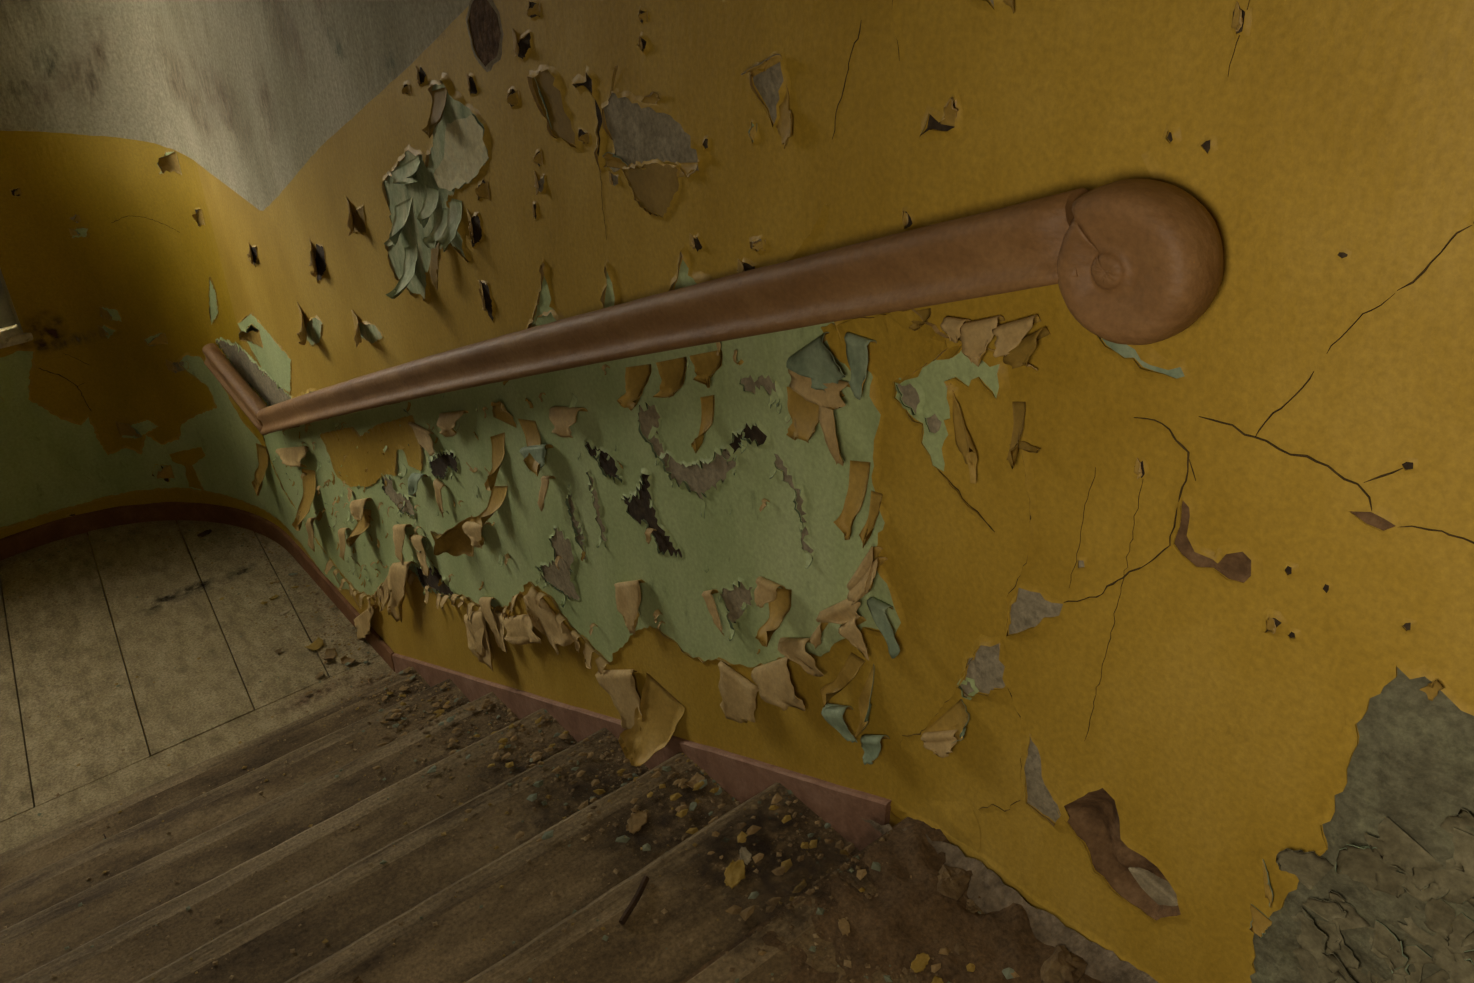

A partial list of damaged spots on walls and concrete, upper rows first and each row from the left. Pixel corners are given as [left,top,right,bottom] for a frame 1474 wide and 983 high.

peeling [246,242,259,268]
peeling [208,277,324,407]
peeling [308,239,329,285]
peeling [346,197,368,236]
peeling [382,0,713,329]
peeling [741,51,793,149]
peeling [0,308,1068,767]
crack [934,467,995,535]
crack [1061,225,1474,741]
spalling [862,799,1168,983]
spalling [1020,730,1192,928]
peeling [1242,654,1474,983]